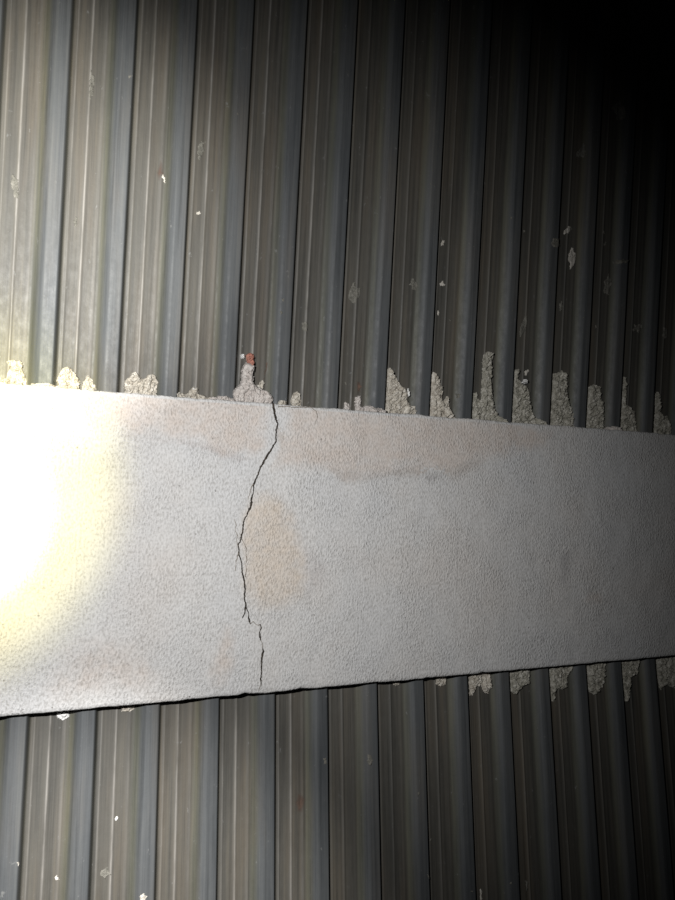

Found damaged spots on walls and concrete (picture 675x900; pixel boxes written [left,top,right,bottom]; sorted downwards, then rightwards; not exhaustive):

crack [234,403,318,689]